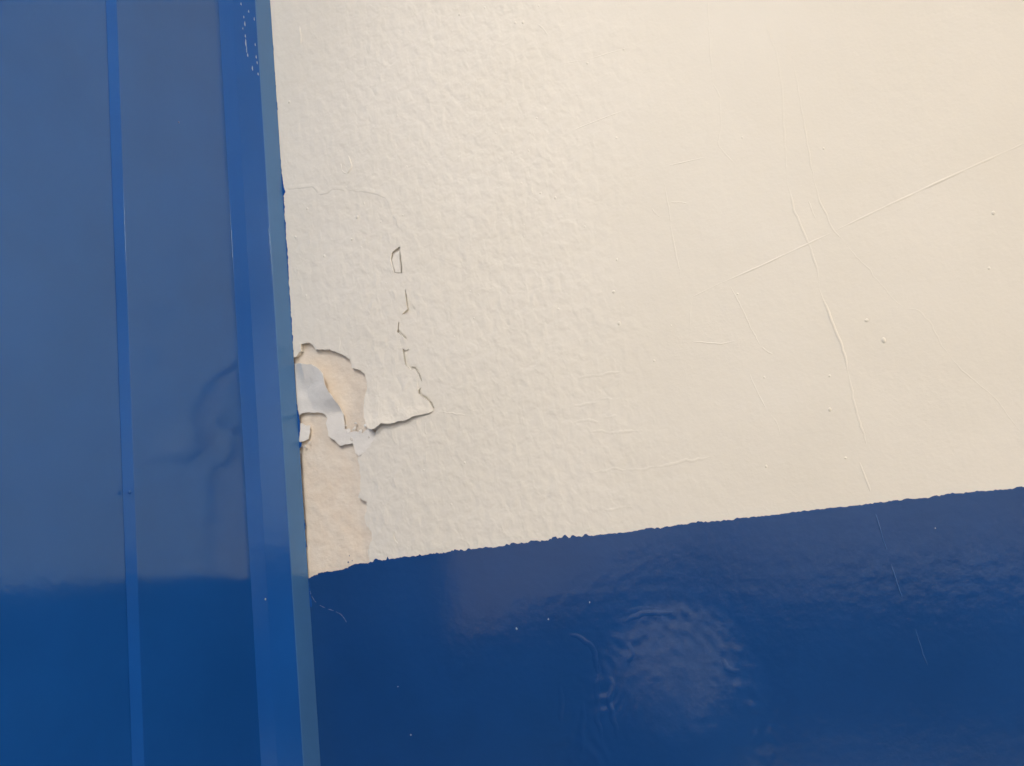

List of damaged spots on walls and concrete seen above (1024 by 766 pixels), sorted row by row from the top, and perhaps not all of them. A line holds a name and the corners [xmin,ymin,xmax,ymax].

peeling [294,334,433,578]